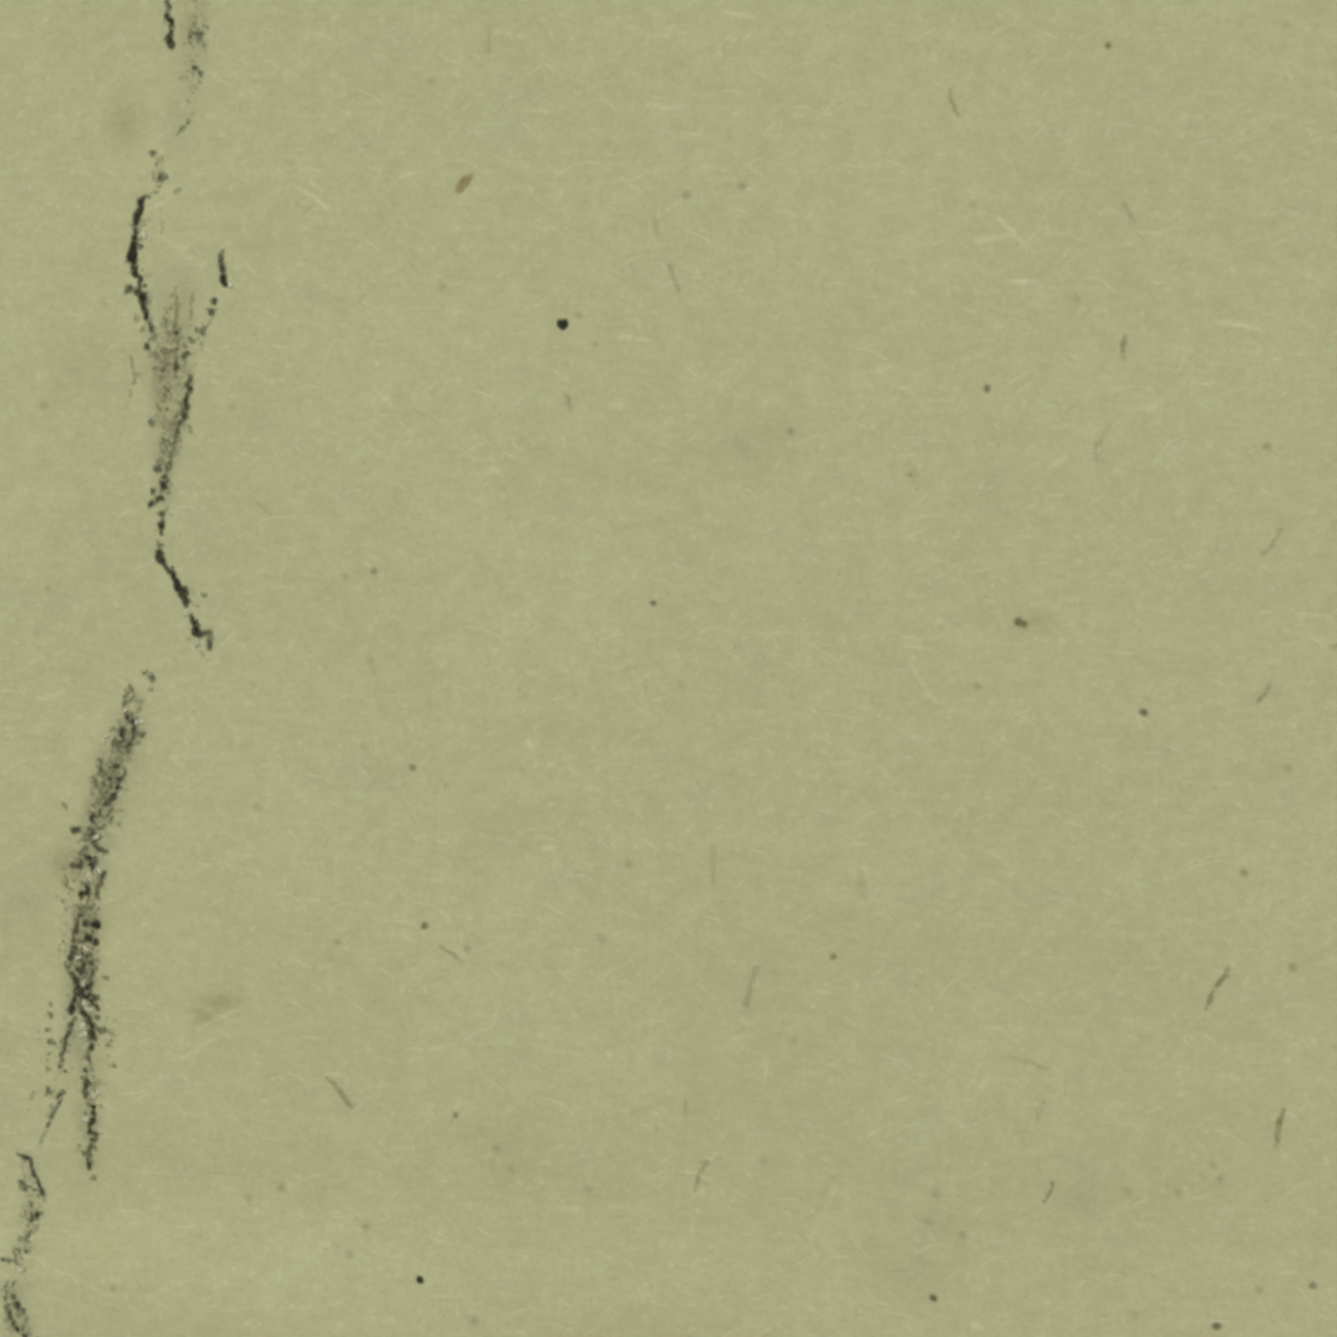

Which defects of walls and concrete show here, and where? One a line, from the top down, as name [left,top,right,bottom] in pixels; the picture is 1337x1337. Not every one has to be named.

crack [166,2,196,68]
crack [127,197,152,348]
crack [213,258,232,302]
crack [176,355,191,418]
crack [149,467,208,645]
crack [59,708,144,1166]
crack [22,1155,44,1195]